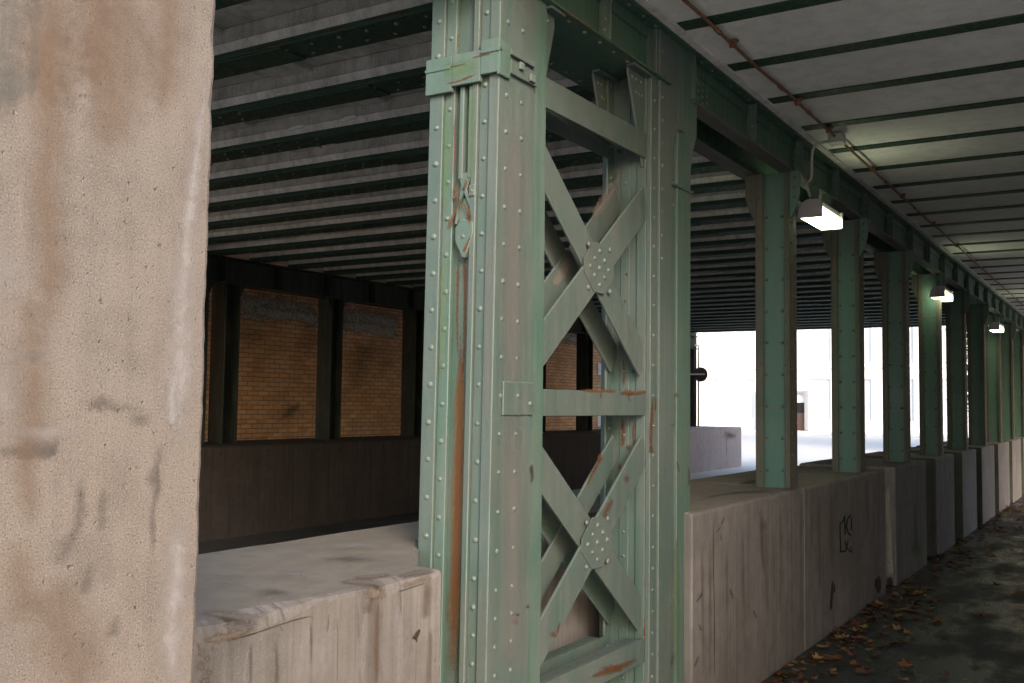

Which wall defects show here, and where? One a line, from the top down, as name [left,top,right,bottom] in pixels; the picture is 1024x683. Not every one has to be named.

rust [449,120,472,226]
rust [451,237,470,643]
rust [582,362,657,452]
rust [594,660,635,677]